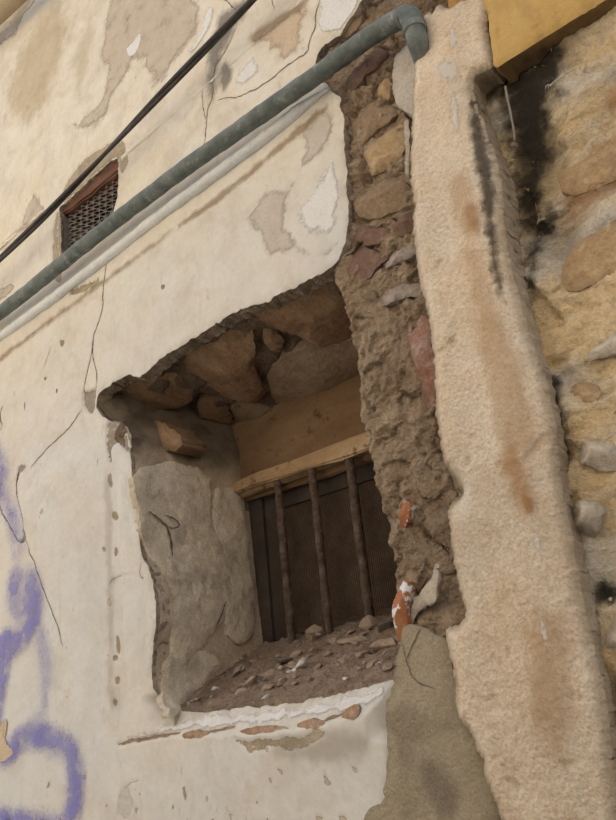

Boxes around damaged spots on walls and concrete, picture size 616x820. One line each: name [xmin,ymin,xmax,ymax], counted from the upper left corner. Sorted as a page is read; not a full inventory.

peeling [79,0,213,127]
crack [202,0,320,143]
spalling [318,0,449,56]
peeling [249,192,293,253]
damp [470,101,501,289]
damp [487,43,565,259]
spalling [323,30,466,637]
crack [0,269,106,644]
spalling [106,420,132,463]
damp [552,376,571,460]
damp [595,582,616,604]
spalling [235,729,325,753]